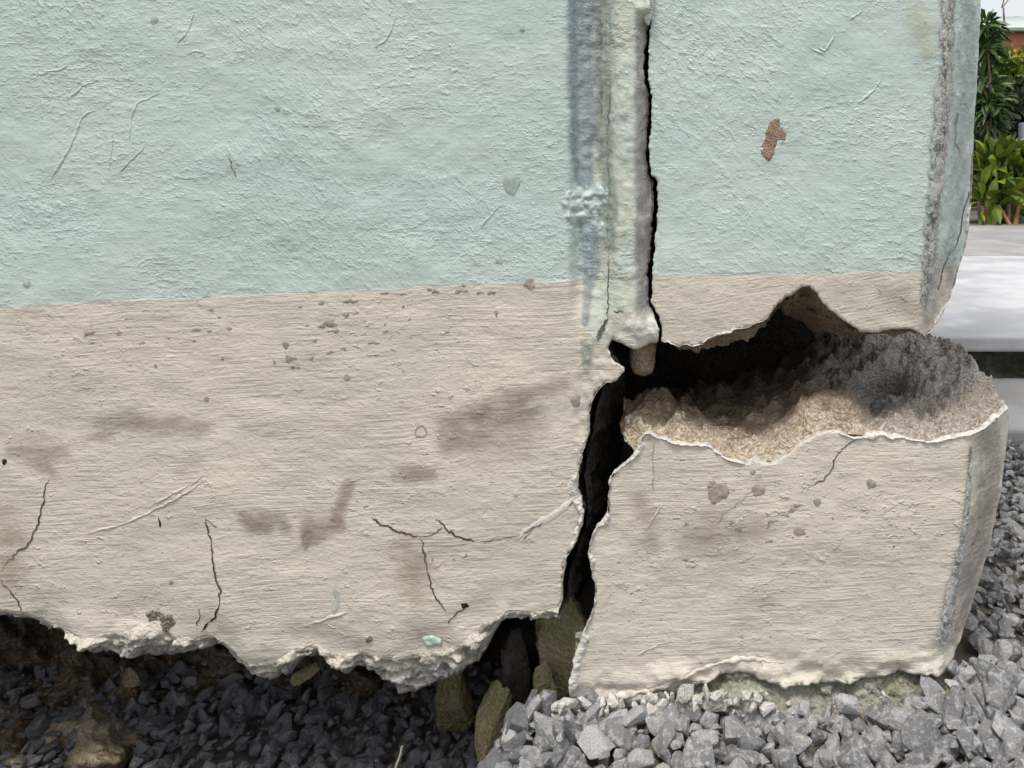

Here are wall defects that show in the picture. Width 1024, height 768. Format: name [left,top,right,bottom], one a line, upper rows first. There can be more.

water stain [568,0,617,325]
crack [644,25,662,338]
peeling [760,118,786,162]
crack [596,256,623,341]
spalling [666,154,974,353]
crack [1,481,49,613]
crack [196,519,222,632]
crack [371,517,541,623]
crack [558,348,660,694]
spalling [643,430,765,497]
crack [807,440,855,489]
spalling [0,589,568,694]